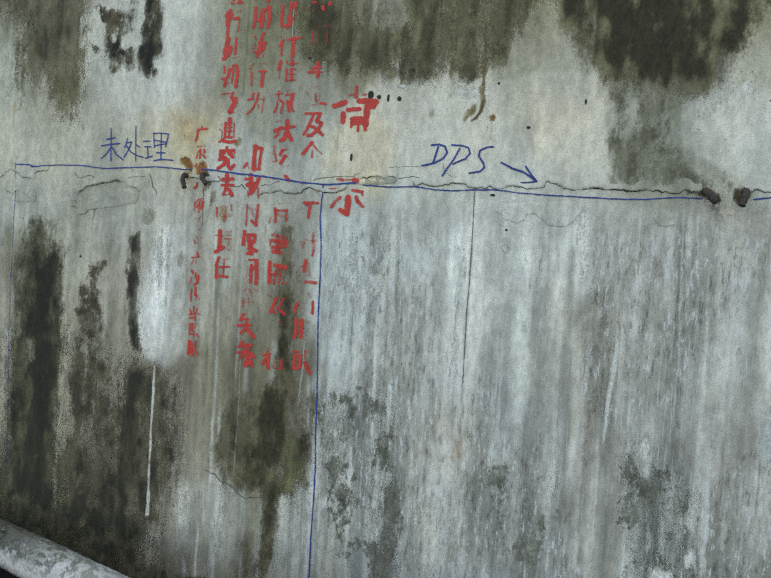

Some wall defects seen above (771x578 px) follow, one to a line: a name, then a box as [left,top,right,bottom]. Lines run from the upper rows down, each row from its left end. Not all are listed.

leakage [0,0,163,120]
leakage [297,0,538,99]
rust [464,21,495,121]
leakage [556,0,771,194]
spalling [69,171,142,221]
rust [180,157,226,222]
crack [189,173,360,225]
rust [733,187,752,204]
crack [745,183,771,193]
leakage [0,218,204,578]
leakage [210,226,405,578]
leakage [420,497,454,578]